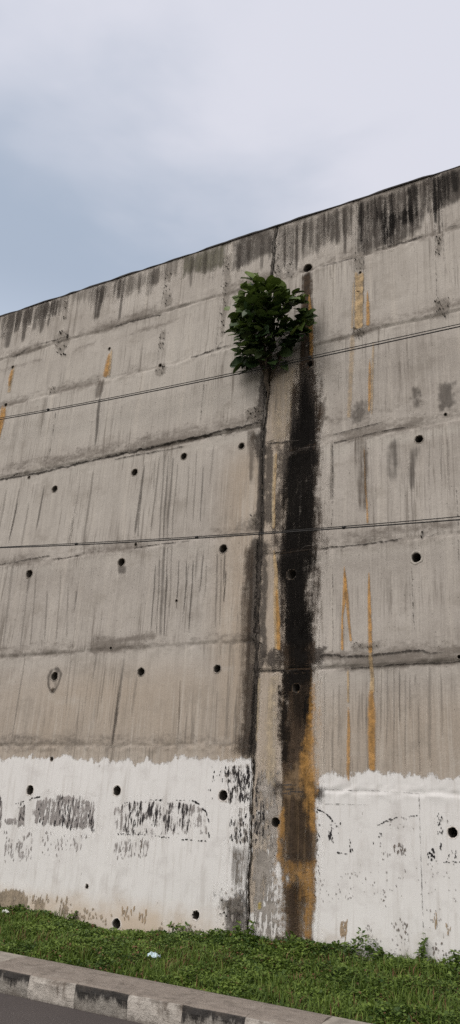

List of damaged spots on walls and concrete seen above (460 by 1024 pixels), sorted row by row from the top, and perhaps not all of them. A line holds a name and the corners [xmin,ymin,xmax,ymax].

water stain [323,169,460,253]
water stain [6,300,58,346]
water stain [94,286,104,318]
crack [270,228,278,298]
water stain [236,228,312,310]
rust [355,273,369,329]
crack [0,384,432,935]
water stain [241,325,325,941]
rust [341,569,352,650]
peeling [0,794,94,863]
peeling [114,799,210,859]
peeling [208,764,282,939]